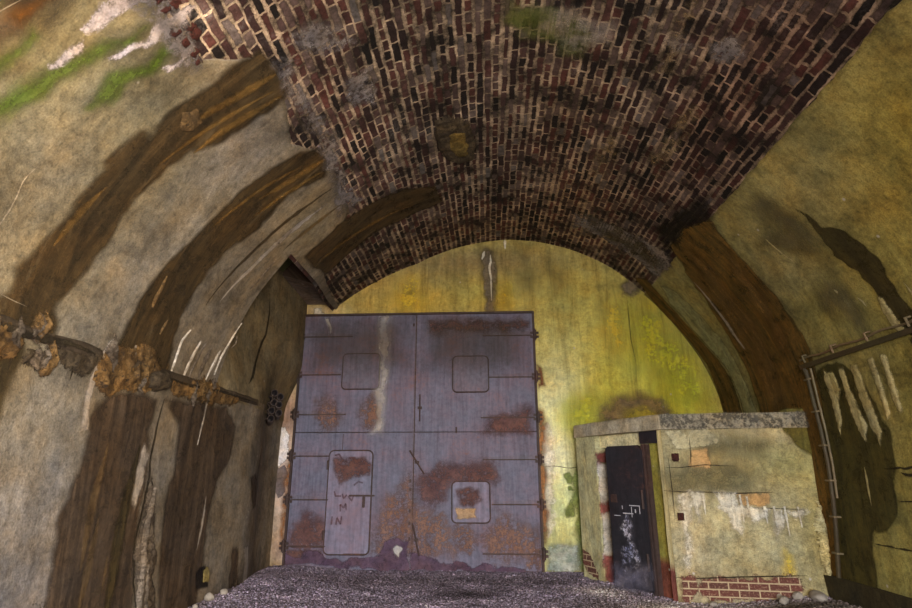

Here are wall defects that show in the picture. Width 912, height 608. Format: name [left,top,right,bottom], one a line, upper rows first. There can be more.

damp [0,0,45,39]
damp [0,49,288,408]
damp [305,187,442,274]
damp [481,248,505,311]
damp [752,198,912,343]
corrosion [428,319,529,335]
damp [45,148,341,608]
damp [621,220,902,588]
corrosion [280,463,325,550]
corrosion [333,457,371,483]
corrosion [373,404,549,559]
flaking render [679,573,804,604]